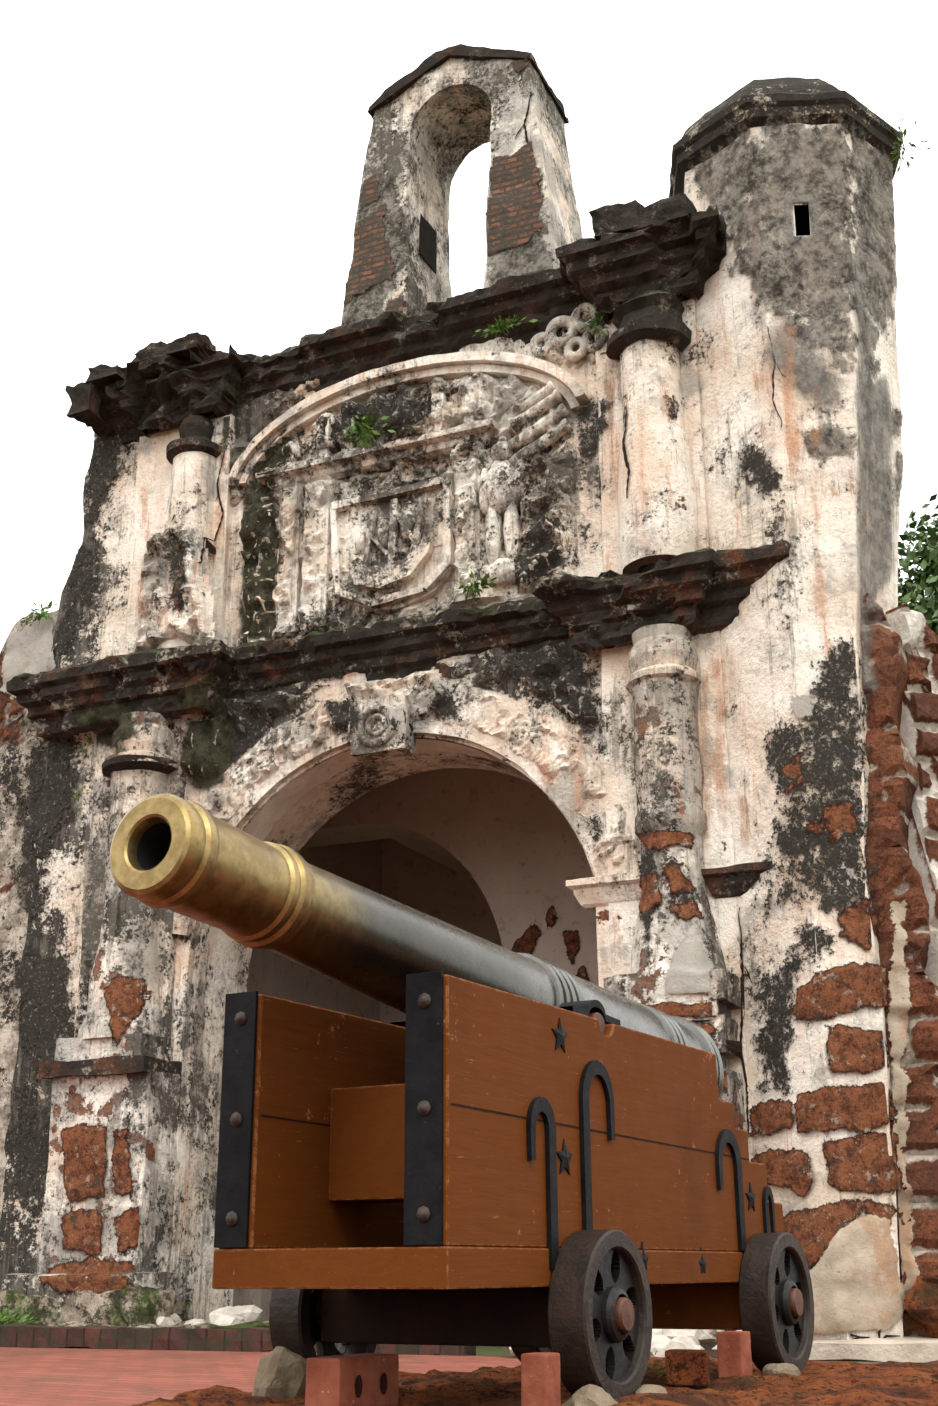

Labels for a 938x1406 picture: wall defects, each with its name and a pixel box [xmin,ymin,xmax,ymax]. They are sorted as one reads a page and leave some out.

spalling [343,174,404,313]
spalling [485,141,545,256]
crack [622,406,630,499]
crack [767,326,786,428]
leakage [686,107,897,689]
spalling [637,830,704,920]
spalling [511,905,590,982]
spalling [103,974,152,1047]
spalling [749,961,907,1269]
spalling [39,1122,144,1294]